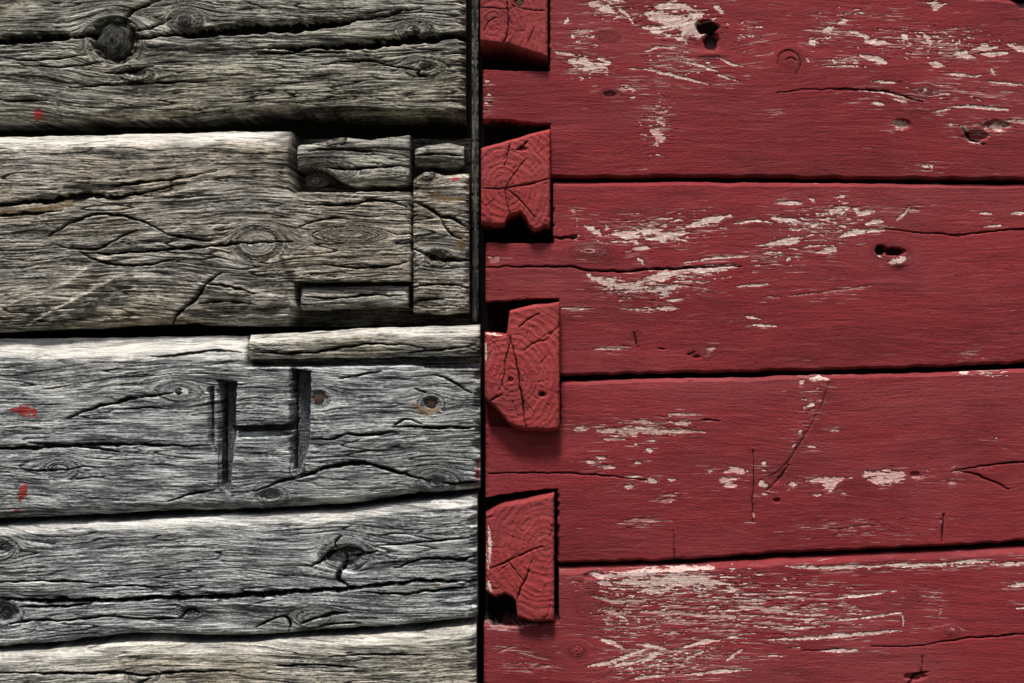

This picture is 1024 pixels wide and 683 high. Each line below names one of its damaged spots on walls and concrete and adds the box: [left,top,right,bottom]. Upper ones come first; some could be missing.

crack [492,313,545,426]